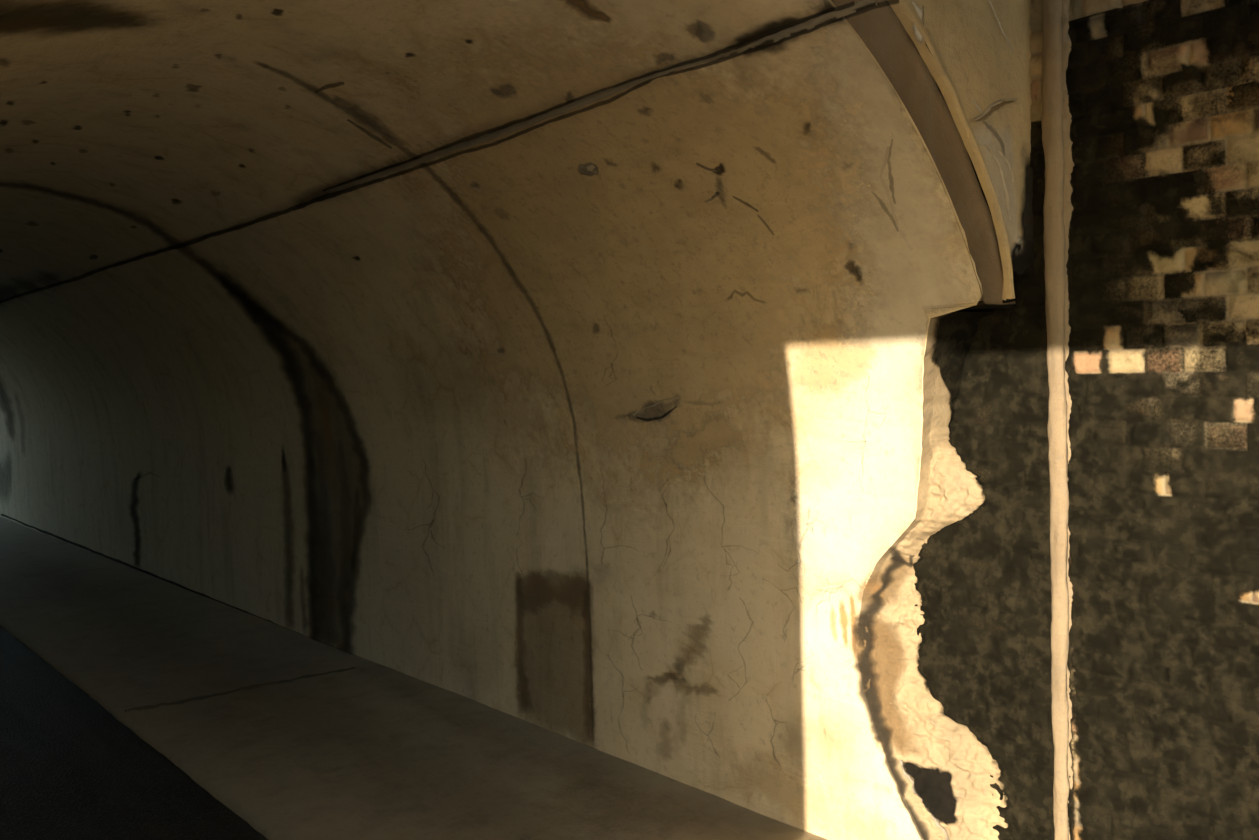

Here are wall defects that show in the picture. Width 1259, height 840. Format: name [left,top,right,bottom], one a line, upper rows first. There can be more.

leakage [0,1,143,33]
crack [0,0,899,640]
peeling [399,20,1008,840]
leakage [913,0,1259,840]
leakage [282,450,292,625]
leakage [517,580,528,706]
leakage [584,596,593,736]
crack [585,562,593,727]
crack [853,549,928,840]